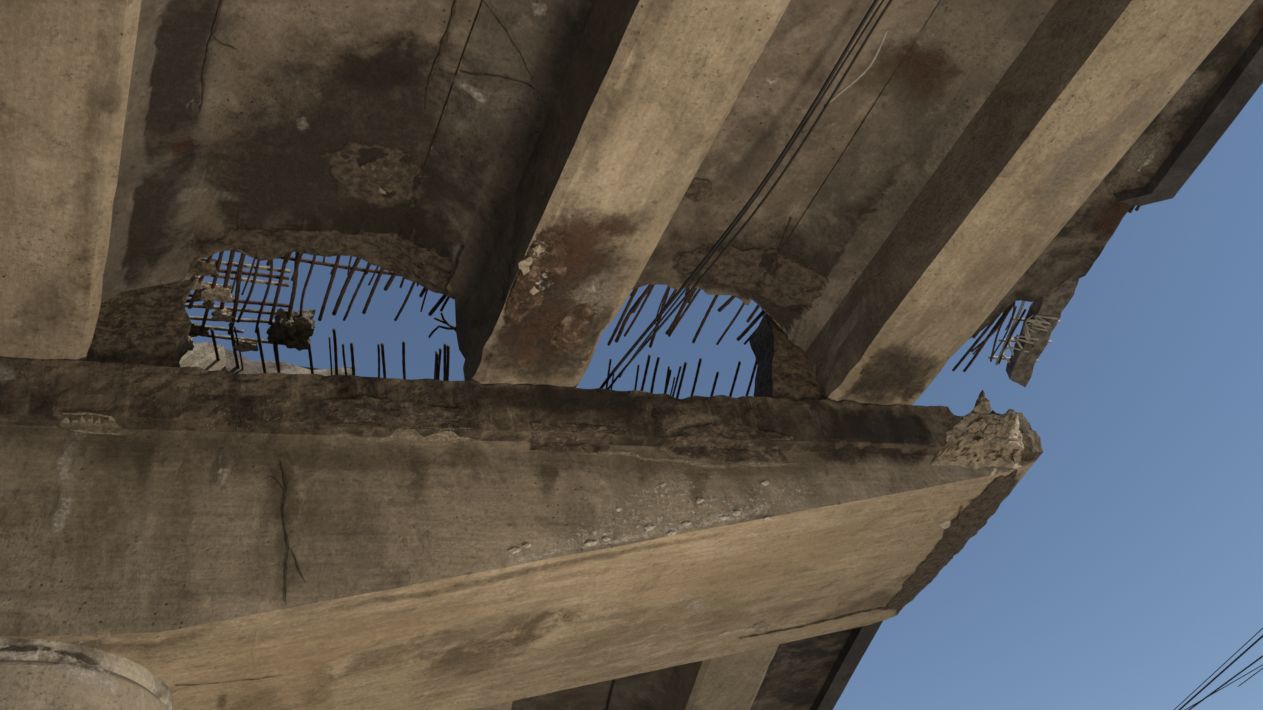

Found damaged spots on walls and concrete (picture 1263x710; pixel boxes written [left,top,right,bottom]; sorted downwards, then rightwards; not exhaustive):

crack [425,0,535,110]
spalling [320,142,431,209]
spalling [184,214,465,381]
spalling [486,217,829,398]
spalling [952,301,1060,372]
crack [263,460,306,602]
spalling [885,390,1024,615]
leakage [0,643,114,693]